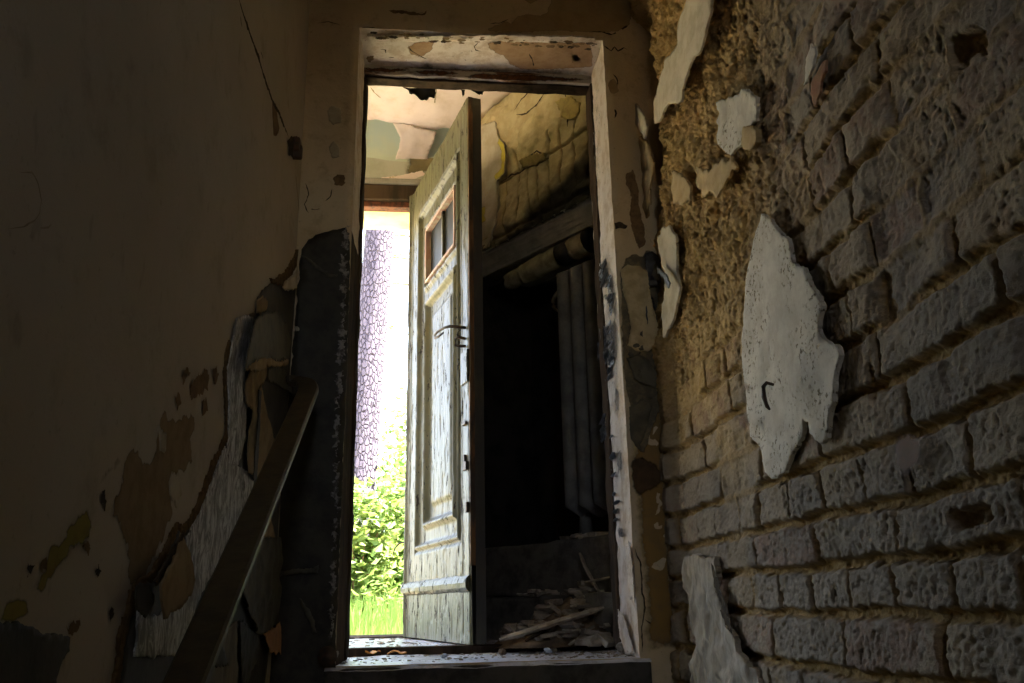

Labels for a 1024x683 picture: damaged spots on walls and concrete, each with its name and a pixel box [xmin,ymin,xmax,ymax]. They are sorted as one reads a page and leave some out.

crack [239,0,288,136]
peeling [367,86,510,179]
peeling [367,31,597,70]
crack [501,150,542,182]
crack [515,93,569,127]
flaking render [671,89,762,205]
spalling [804,43,828,107]
peeling [597,0,714,602]
flaking render [739,213,845,479]
peeling [101,225,350,683]
peeling [27,511,101,591]
peeling [616,609,635,655]